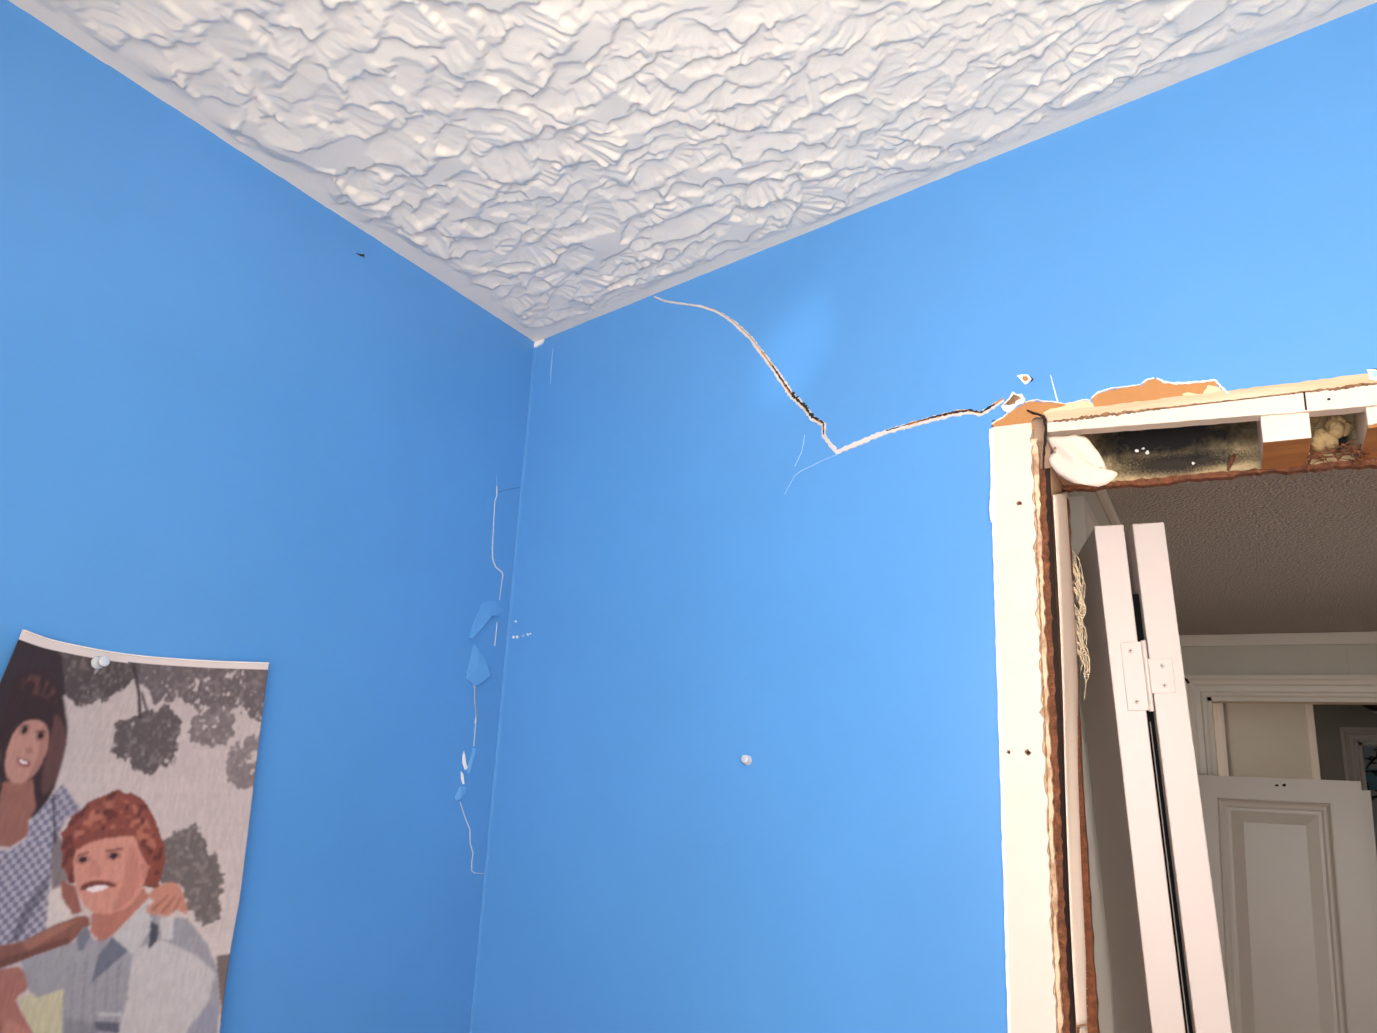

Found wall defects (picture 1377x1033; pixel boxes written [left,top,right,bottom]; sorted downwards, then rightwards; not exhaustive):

crack [654,296,1004,493]
crack [454,475,521,874]
peeling [989,377,1229,1033]